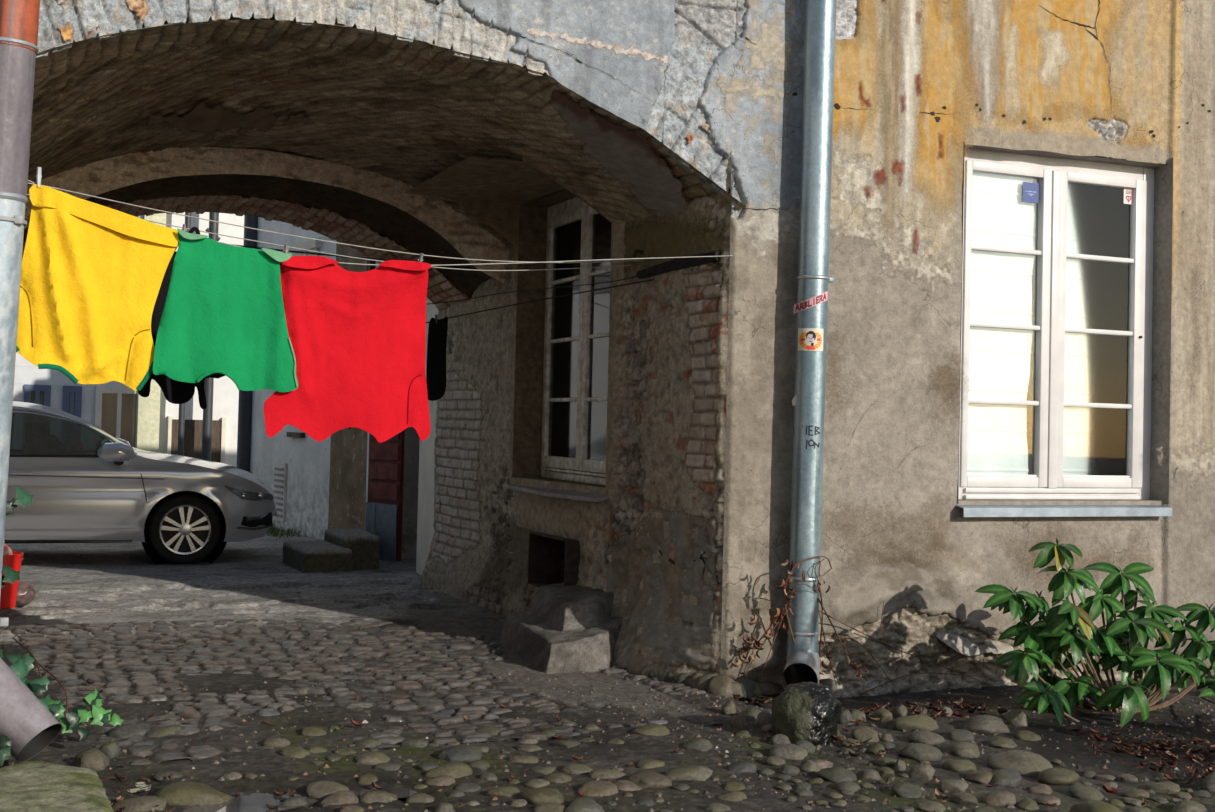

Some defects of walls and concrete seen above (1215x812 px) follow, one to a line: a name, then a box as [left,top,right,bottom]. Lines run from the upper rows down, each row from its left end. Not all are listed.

spalling [36,0,800,257]
peeling [830,0,955,291]
peeling [909,0,1128,209]
crack [1041,0,1112,113]
spalling [682,264,724,495]
spalling [818,605,1146,698]